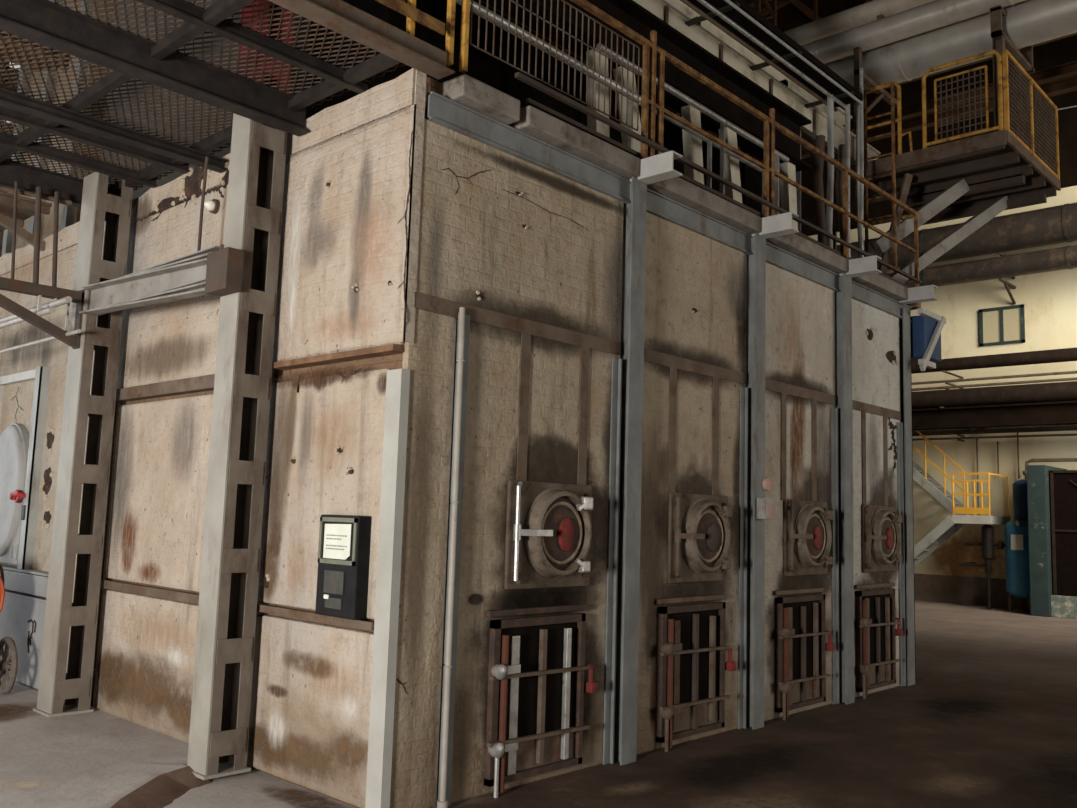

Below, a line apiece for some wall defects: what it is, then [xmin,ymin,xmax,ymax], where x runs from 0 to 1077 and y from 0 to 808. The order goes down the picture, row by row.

flaking render [155,163,230,213]
crack [337,108,412,340]
crack [441,168,588,230]
flaking render [47,426,55,452]
corrosion [791,400,804,486]
flaking render [39,467,53,530]
corrosion [123,520,135,567]
damp [95,656,191,731]
damp [287,654,329,676]
damp [249,714,365,774]